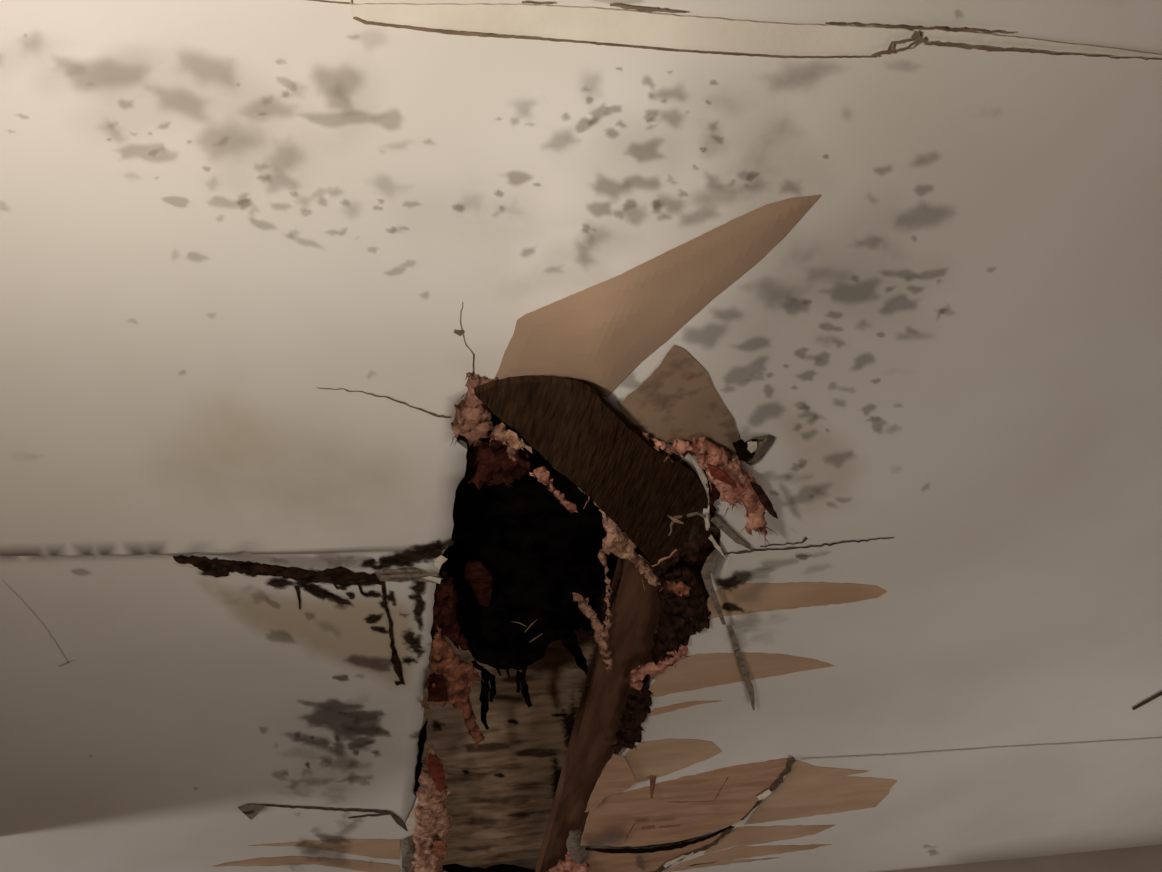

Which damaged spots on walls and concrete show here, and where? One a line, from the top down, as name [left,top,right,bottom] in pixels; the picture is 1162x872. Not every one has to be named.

crack [308,0,1162,60]
peeling [495,195,821,398]
leakage [296,700,389,755]